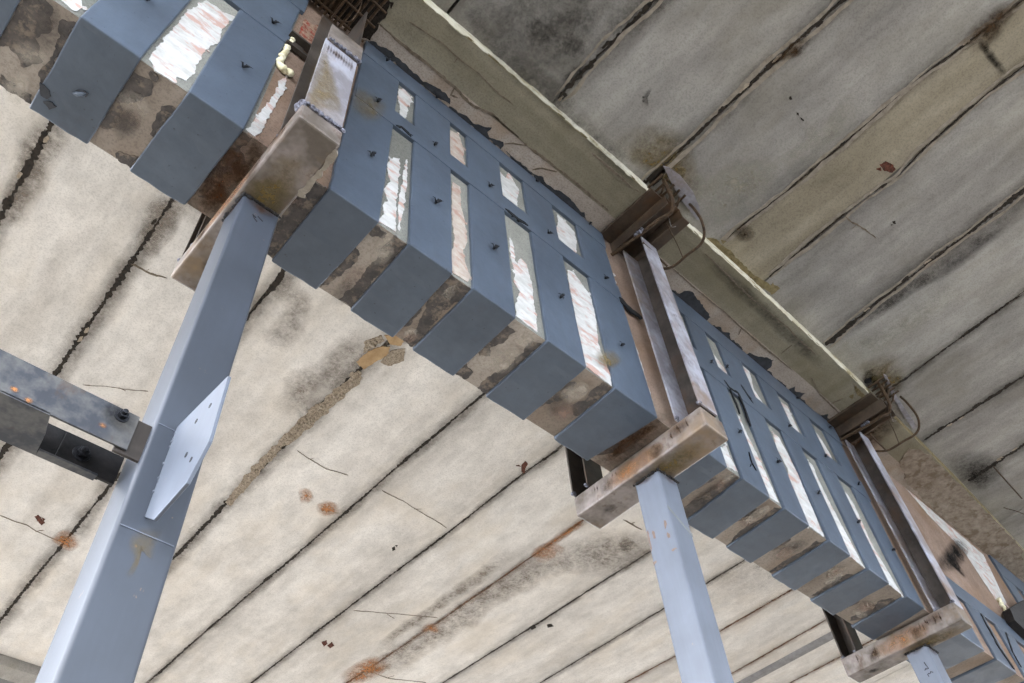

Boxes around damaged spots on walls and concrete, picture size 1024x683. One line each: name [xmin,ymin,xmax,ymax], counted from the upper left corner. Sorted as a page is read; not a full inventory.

spalling [198,75,288,199]
crack [321,366,363,403]
spalling [225,182,472,506]
crack [148,393,664,683]
damp [398,566,539,657]
crack [705,559,745,584]
corrosion [348,660,383,681]